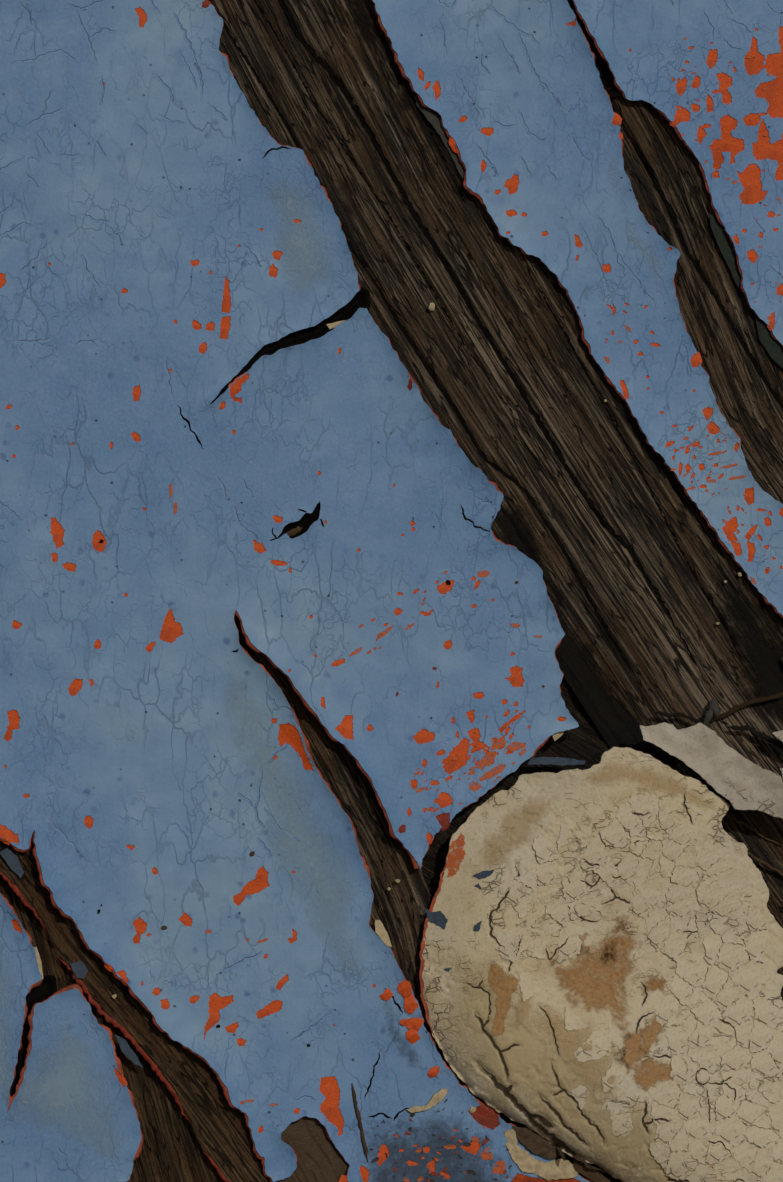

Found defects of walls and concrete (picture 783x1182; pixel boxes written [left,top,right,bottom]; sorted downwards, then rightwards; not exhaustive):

crack [567,0,783,411]
peeling [192,277,231,354]
crack [164,0,743,703]
peeling [202,0,783,928]
peeling [145,609,184,652]
spalling [4,710,20,741]
peeling [189,993,246,1046]
peeling [256,974,289,1019]
crack [468,812,650,1173]
crack [636,983,655,1031]
crack [642,1100,671,1133]
crack [653,1038,745,1182]